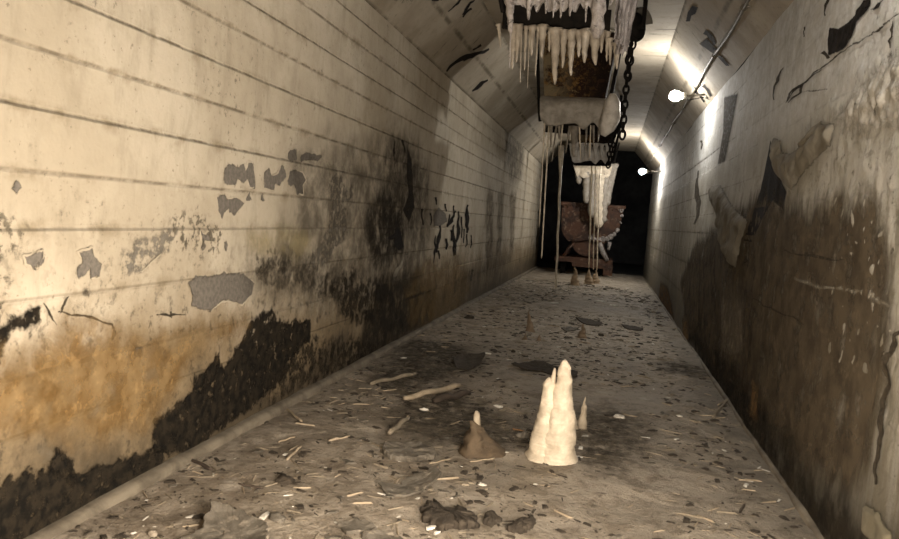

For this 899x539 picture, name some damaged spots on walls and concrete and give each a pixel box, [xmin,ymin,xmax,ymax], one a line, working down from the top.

spalling [828,0,880,55]
peeling [216,149,322,221]
peeling [189,271,254,312]
leakage [0,150,472,539]
leakage [681,192,890,539]